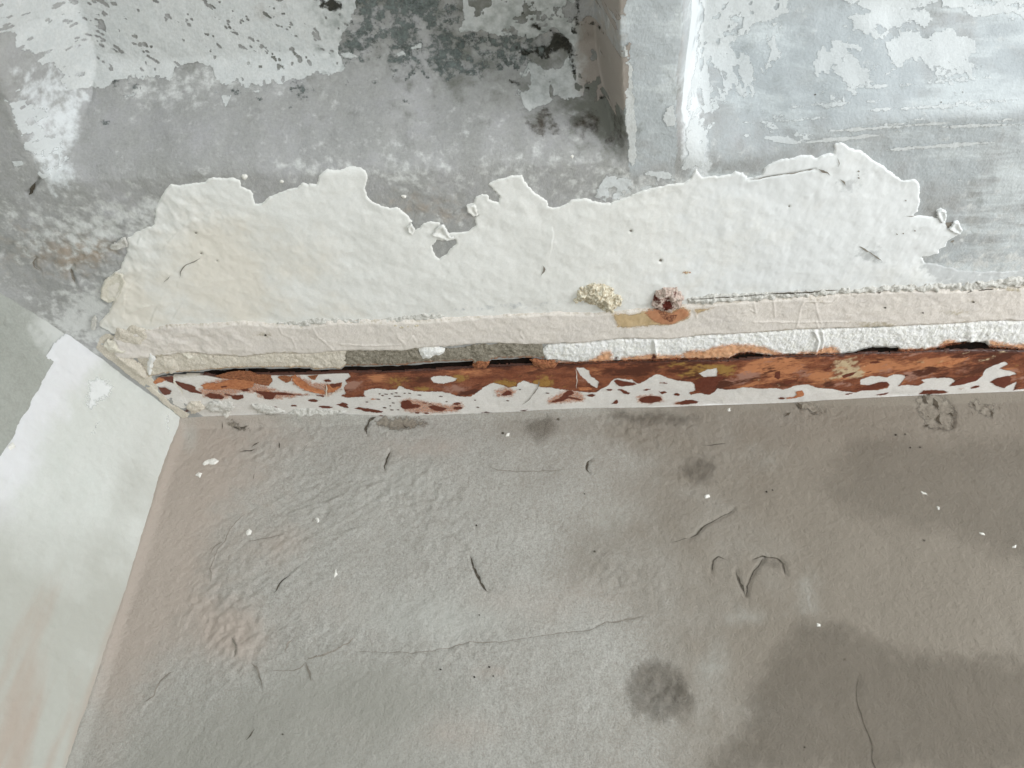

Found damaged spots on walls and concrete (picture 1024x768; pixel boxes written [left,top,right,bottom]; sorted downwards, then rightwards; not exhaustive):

peeling [4,89,69,179]
peeling [0,0,358,107]
peeling [459,0,637,165]
peeling [594,0,789,202]
peeling [743,0,1024,147]
peeling [936,209,963,235]
corrosion [153,340,1024,416]
crack [675,509,734,542]
crack [471,558,488,592]
crack [712,555,786,595]
crack [231,616,642,688]
crack [856,681,876,768]